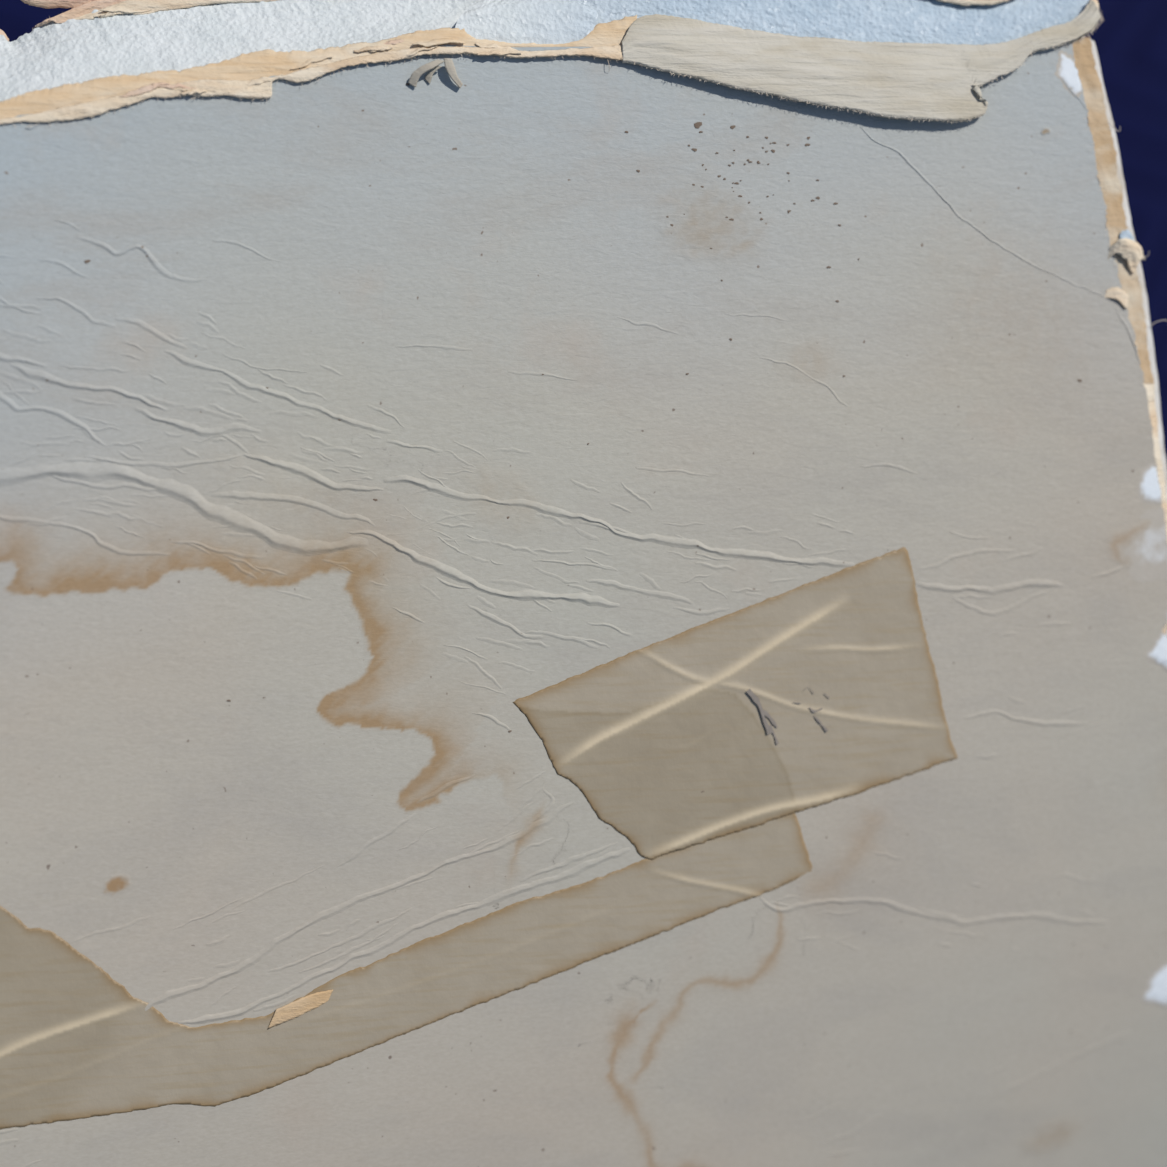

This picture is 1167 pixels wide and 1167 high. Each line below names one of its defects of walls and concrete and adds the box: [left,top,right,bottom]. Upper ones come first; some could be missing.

peeling [21,0,152,13]
peeling [354,39,438,60]
peeling [475,43,522,56]
peeling [119,82,206,98]
spalling [1054,50,1082,98]
leakage [0,414,330,602]
spalling [1124,463,1167,583]
spalling [1144,629,1167,672]
leakage [312,583,603,876]
leakage [569,765,947,1167]
spalling [1139,962,1167,1008]